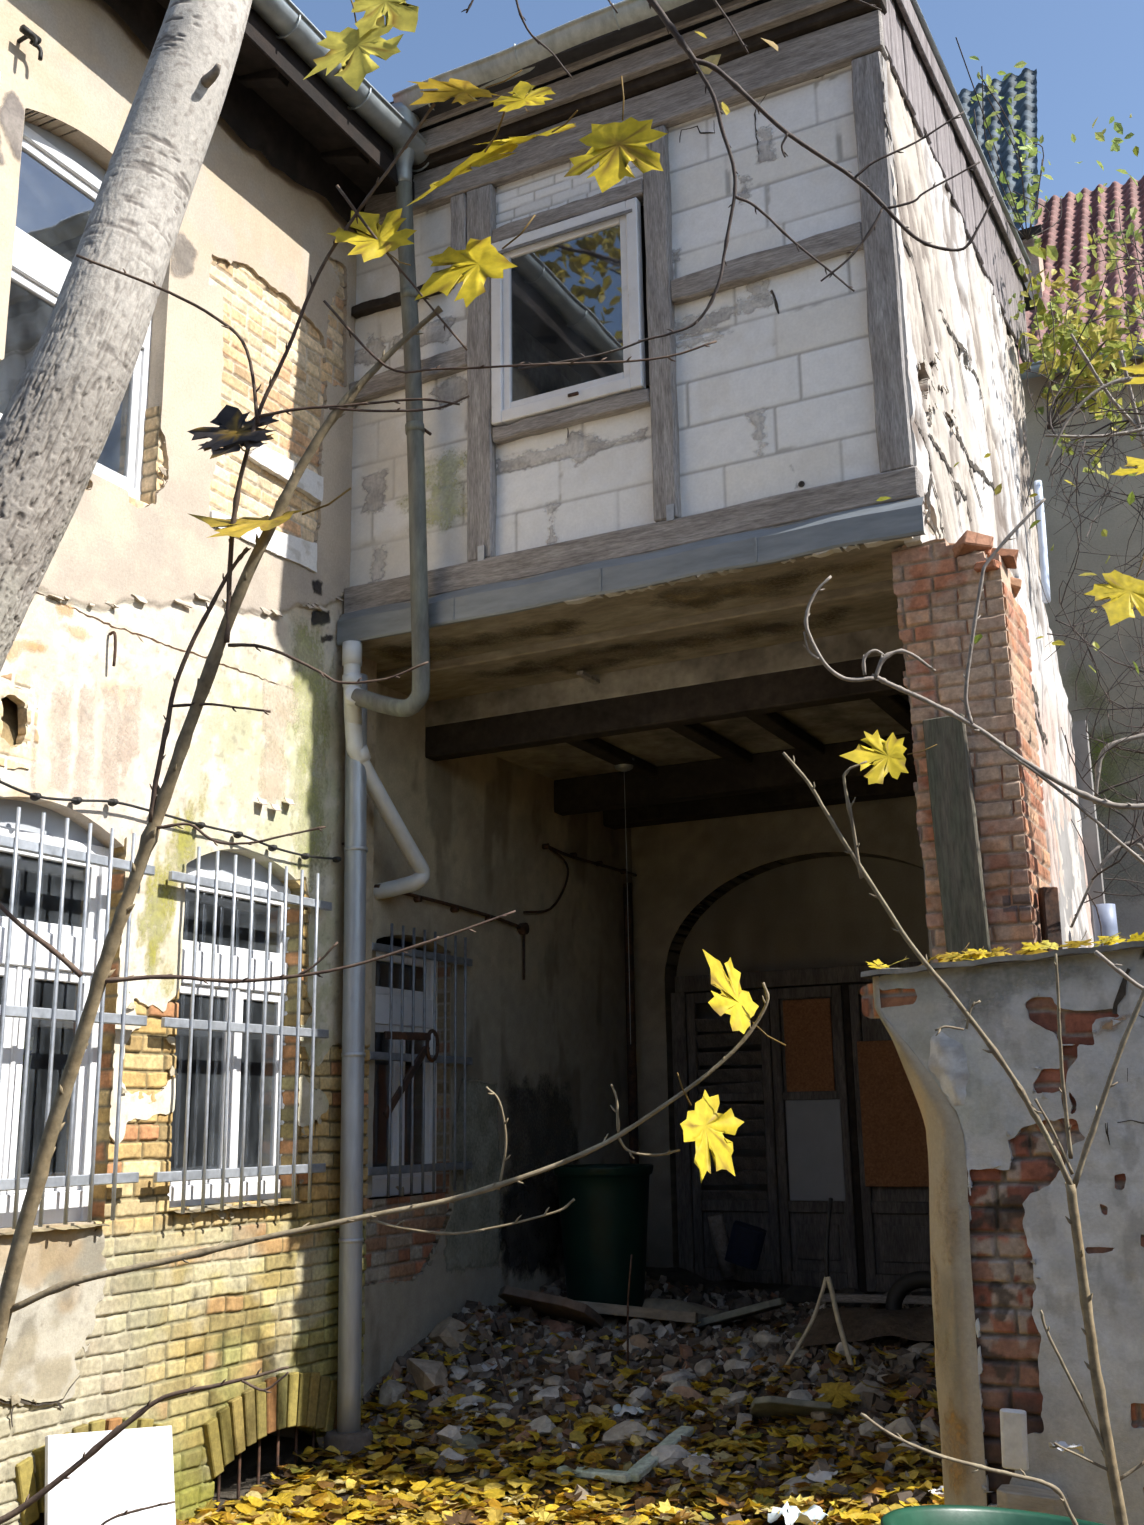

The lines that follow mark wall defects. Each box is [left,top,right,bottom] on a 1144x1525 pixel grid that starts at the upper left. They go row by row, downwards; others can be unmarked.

spalling [129,435,167,508]
spalling [209,257,348,542]
crack [880,55,995,540]
spalling [0,673,39,769]
leakage [292,625,331,866]
leakage [138,811,195,991]
spalling [280,876,313,1025]
spalling [0,989,342,1525]
spalling [361,1044,451,1410]
leakage [444,1076,578,1277]
spalling [967,993,1121,1507]
spalling [1131,1403,1144,1428]